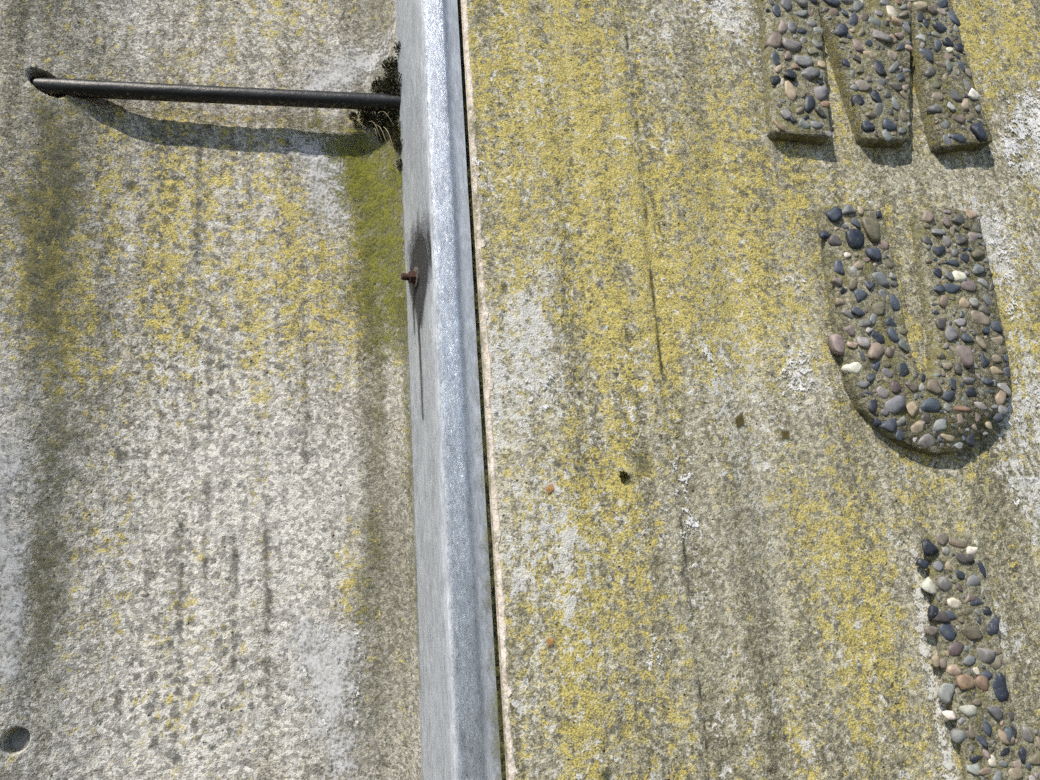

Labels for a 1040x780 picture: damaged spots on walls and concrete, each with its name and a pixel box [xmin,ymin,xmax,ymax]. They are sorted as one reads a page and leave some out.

damp [397,221,431,547]